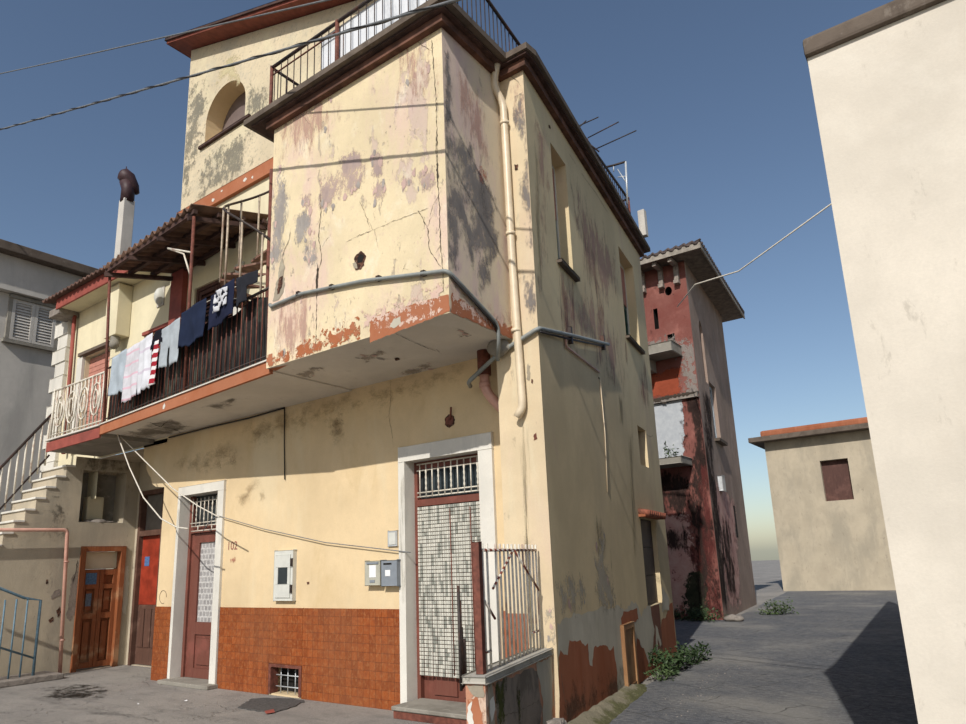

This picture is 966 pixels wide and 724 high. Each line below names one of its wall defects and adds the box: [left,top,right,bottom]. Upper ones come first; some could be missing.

water stain [183,86,251,197]
water stain [270,165,288,270]
crack [314,40,444,344]
water stain [445,52,498,287]
peeling [266,282,511,367]
crack [653,391,696,404]
water stain [661,391,738,619]
flaking render [467,512,710,724]